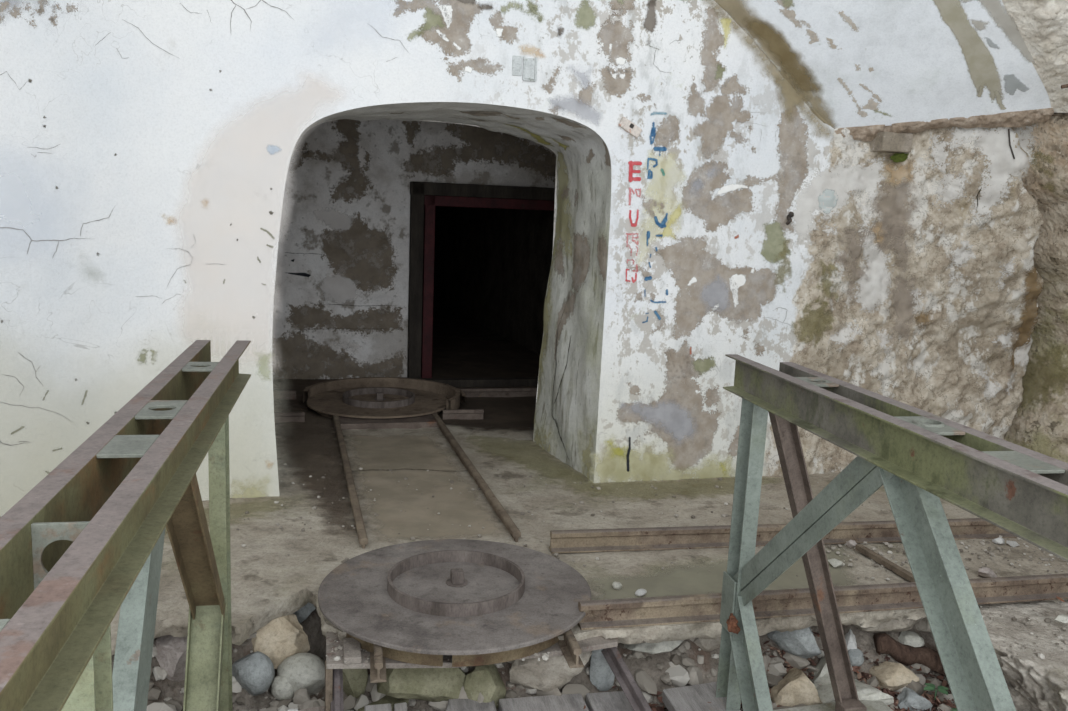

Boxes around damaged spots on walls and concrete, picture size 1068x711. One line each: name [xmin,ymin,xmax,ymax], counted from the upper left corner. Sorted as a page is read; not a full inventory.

crack [182,0,294,30]
peeling [392,0,518,82]
peeling [535,0,652,142]
water stain [711,0,834,135]
water stain [933,0,1034,110]
crack [0,210,113,256]
peeling [289,119,399,293]
peeling [390,111,579,206]
peeling [586,141,611,169]
peeling [616,0,1054,472]
peeling [272,302,407,380]
peeling [554,232,608,360]